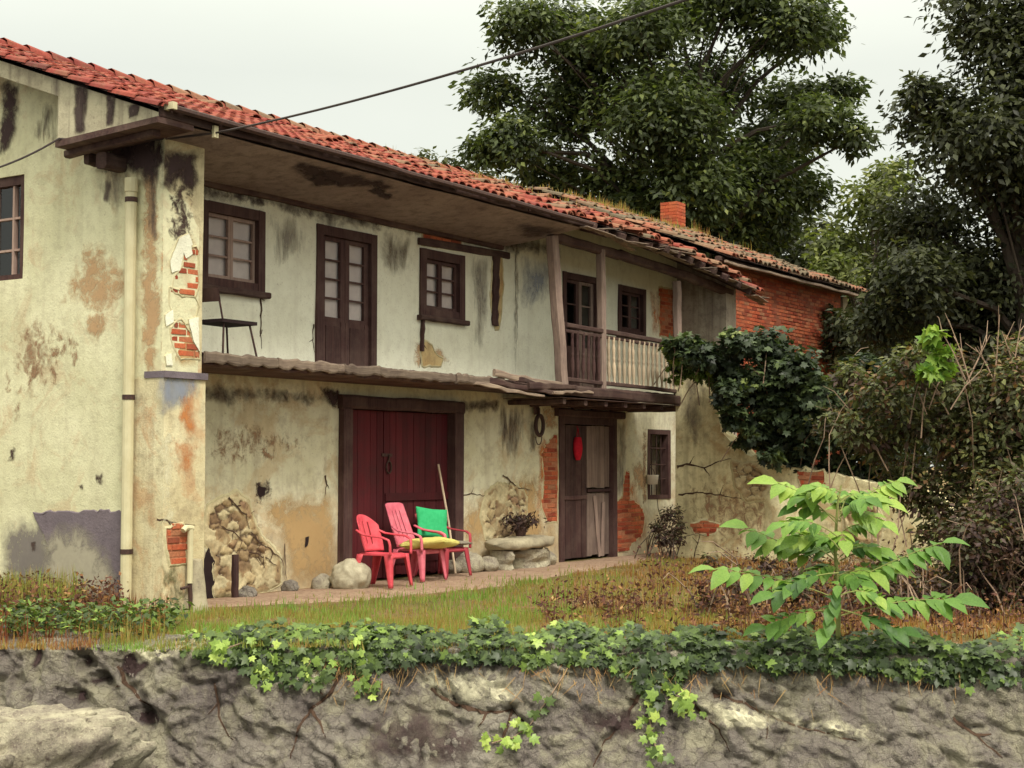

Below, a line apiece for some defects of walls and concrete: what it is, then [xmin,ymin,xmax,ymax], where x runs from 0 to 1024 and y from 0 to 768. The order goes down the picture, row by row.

water stain [0,82,18,153]
water stain [110,140,391,237]
flaking render [161,233,202,366]
flaking render [658,286,673,338]
flaking render [419,339,444,369]
flaking render [163,521,187,567]
flaking render [519,434,559,535]
flaking render [617,433,647,553]
flaking render [689,518,721,536]
crack [677,458,741,499]